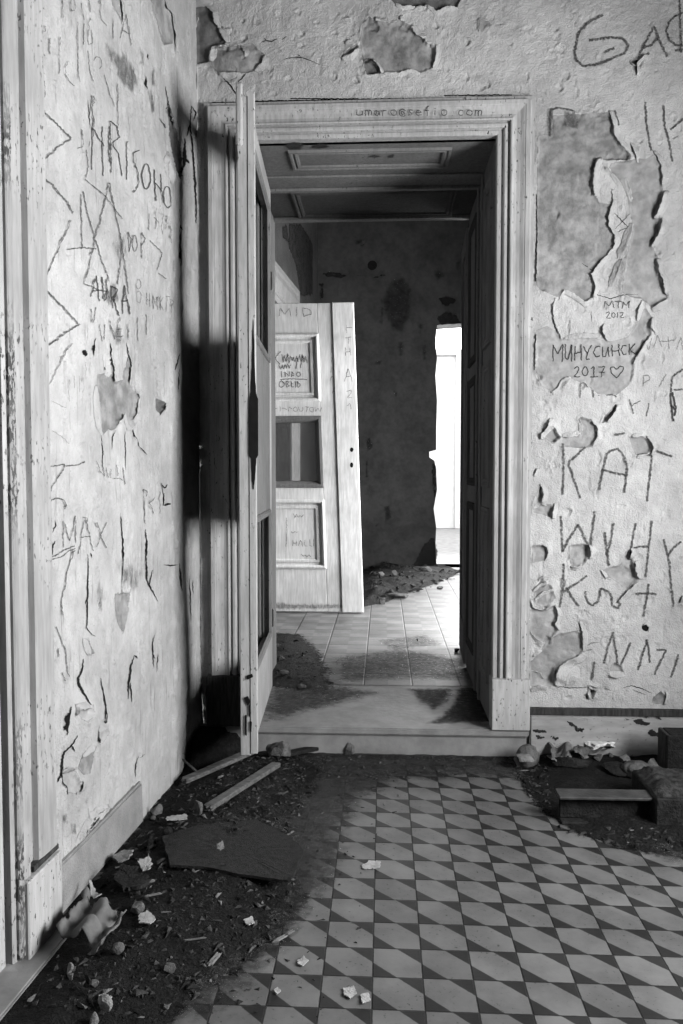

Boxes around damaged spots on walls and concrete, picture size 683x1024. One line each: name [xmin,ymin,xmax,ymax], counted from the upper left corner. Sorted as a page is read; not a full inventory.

peeling [196,6,269,79]
peeling [341,0,460,77]
peeling [536,110,670,448]
peeling [93,353,142,435]
peeling [630,433,662,459]
peeling [533,468,558,519]
peeling [532,544,553,563]
peeling [569,544,596,571]
peeling [600,548,643,604]
peeling [529,576,588,692]
peeling [587,663,625,699]
peeling [62,702,109,795]